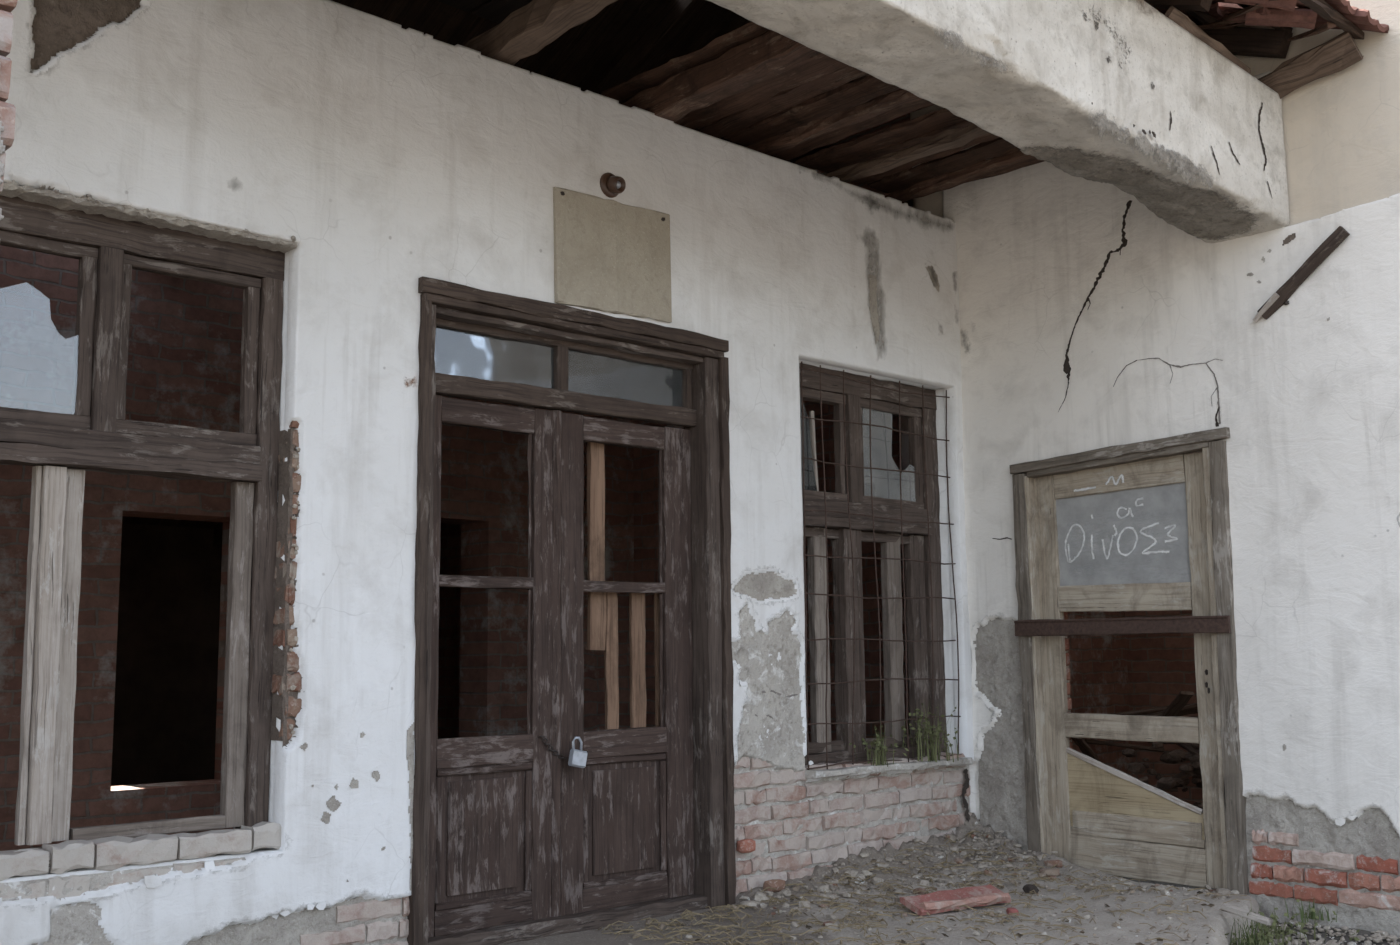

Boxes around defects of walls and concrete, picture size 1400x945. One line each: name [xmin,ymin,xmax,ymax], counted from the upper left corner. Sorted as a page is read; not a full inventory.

flaking render [30,0,141,72]
flaking render [0,144,297,253]
crack [1211,103,1272,196]
damp [865,235,884,350]
crack [1058,200,1134,412]
crack [1113,358,1223,427]
spalling [271,421,308,751]
flaking render [731,568,1028,896]
flaking render [0,822,281,945]
flaking render [186,722,415,945]
flaking render [1246,795,1400,937]